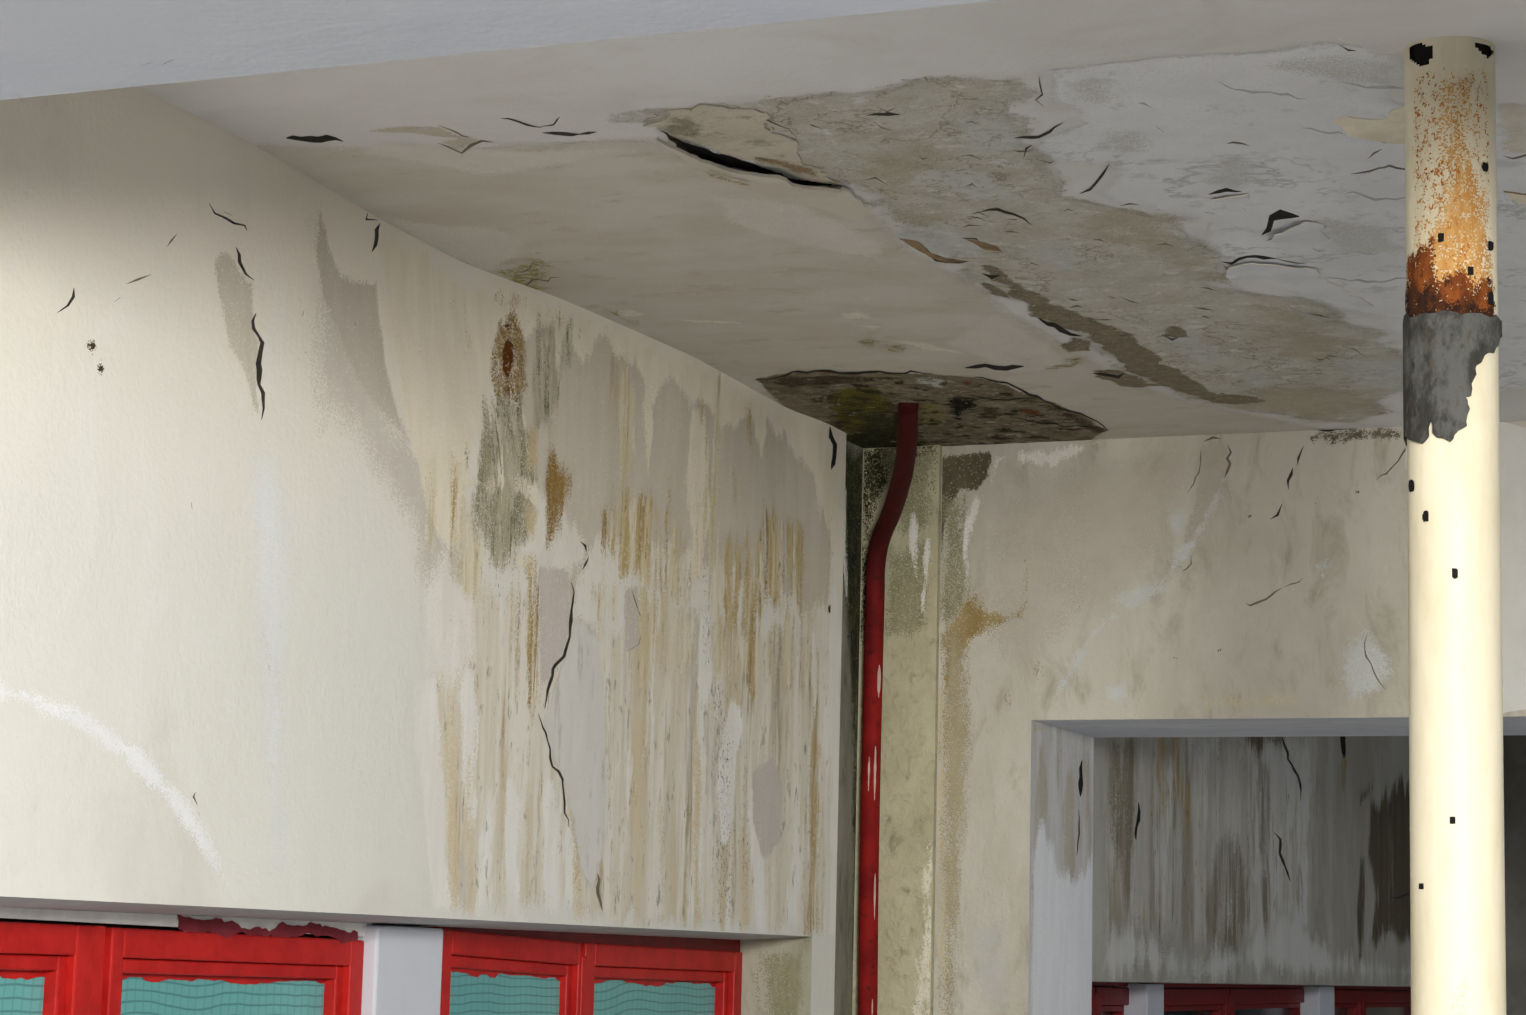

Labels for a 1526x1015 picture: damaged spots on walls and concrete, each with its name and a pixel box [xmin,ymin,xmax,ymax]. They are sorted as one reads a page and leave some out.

spalling [608,39,1406,426]
corrosion [1405,67,1496,317]
peeling [1496,110,1526,393]
crack [538,541,589,827]
leakage [255,117,1411,1015]
crack [1246,578,1303,606]
crack [1271,428,1357,519]
crack [1364,633,1385,689]
crack [1377,448,1406,479]